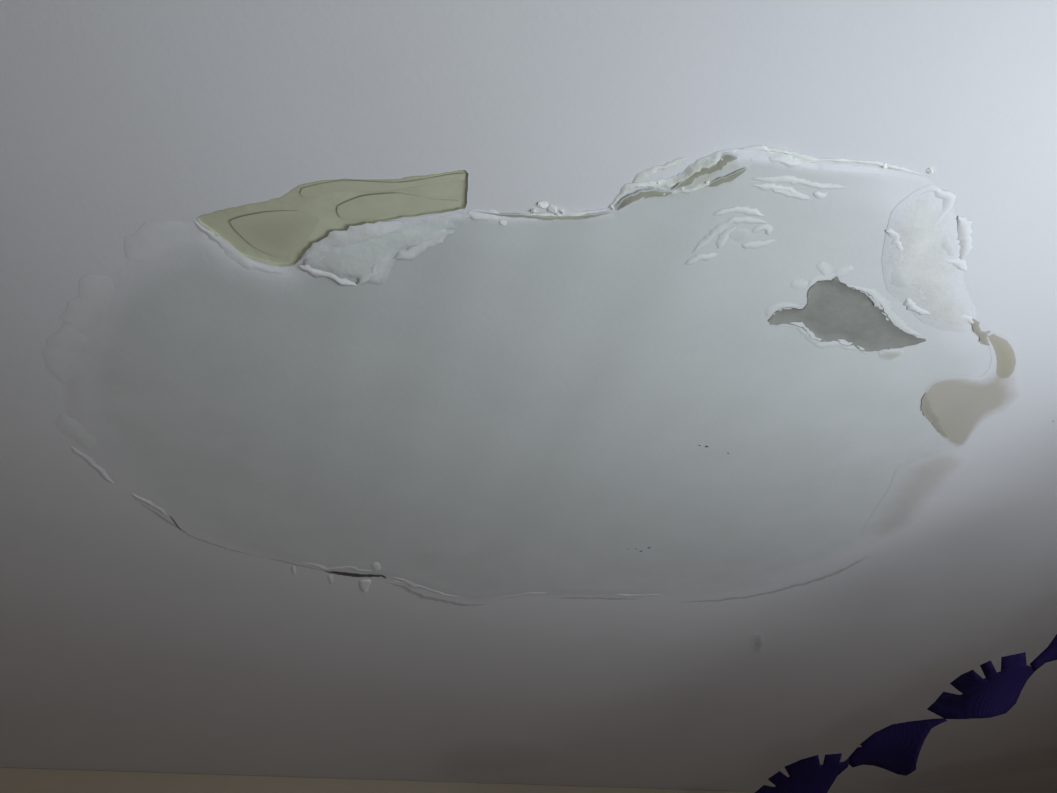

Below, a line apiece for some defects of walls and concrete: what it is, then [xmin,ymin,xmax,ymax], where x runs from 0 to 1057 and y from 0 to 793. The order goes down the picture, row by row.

peeling [194,170,500,286]
water stain [861,311,1024,545]
crack [71,446,870,606]